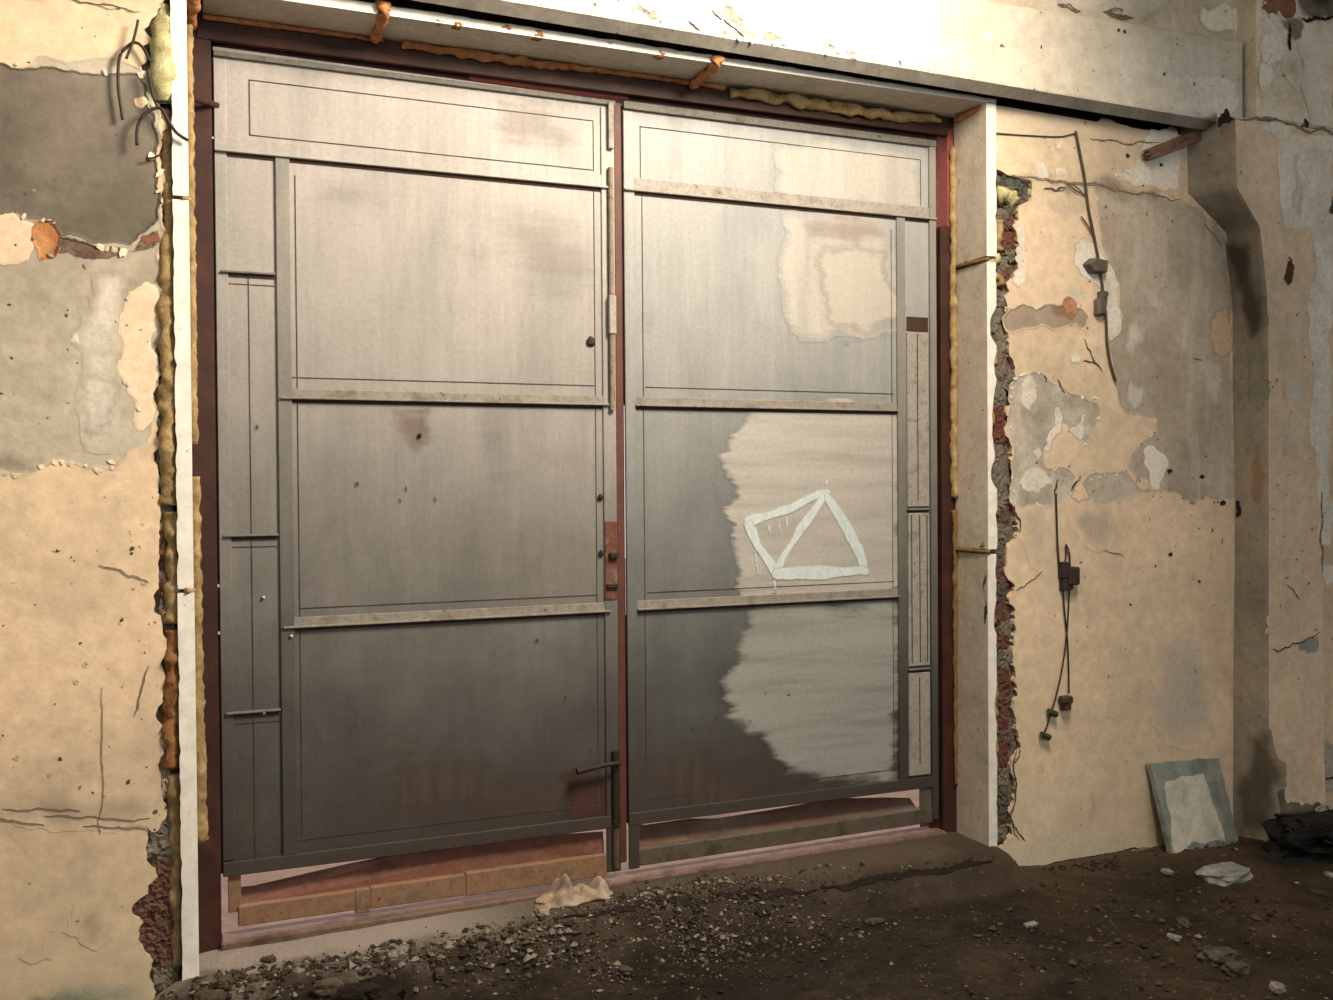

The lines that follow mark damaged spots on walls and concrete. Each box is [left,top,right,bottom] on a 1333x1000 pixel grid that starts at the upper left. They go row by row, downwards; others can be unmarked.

crack [39,0,140,12]
spalling [630,2,664,23]
spalling [718,3,787,46]
flaking render [1262,0,1305,41]
spalling [0,17,166,478]
peeling [984,172,1242,842]
flaking render [142,505,172,625]
crack [1274,632,1320,652]
flaking render [132,743,179,991]